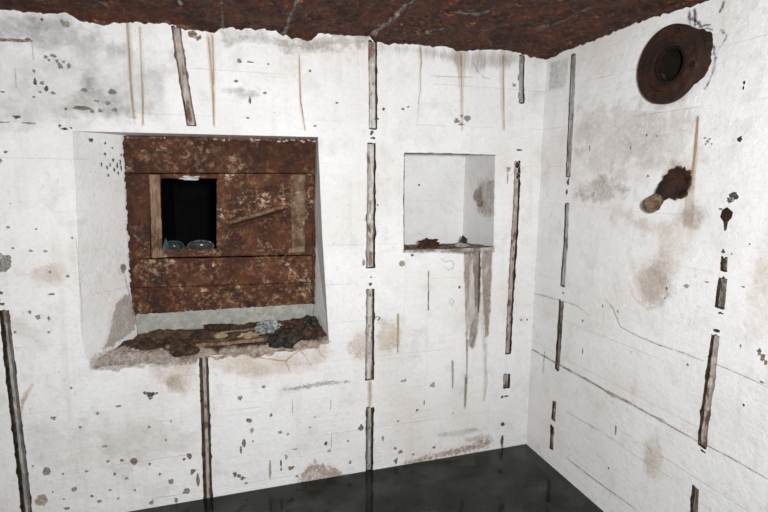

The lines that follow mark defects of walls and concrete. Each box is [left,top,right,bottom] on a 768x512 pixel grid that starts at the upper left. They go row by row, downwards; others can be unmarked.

rust [694,27,713,84]
rust [123,136,137,315]
peeling [91,294,197,371]
damp [404,247,492,371]
crack [533,350,752,471]